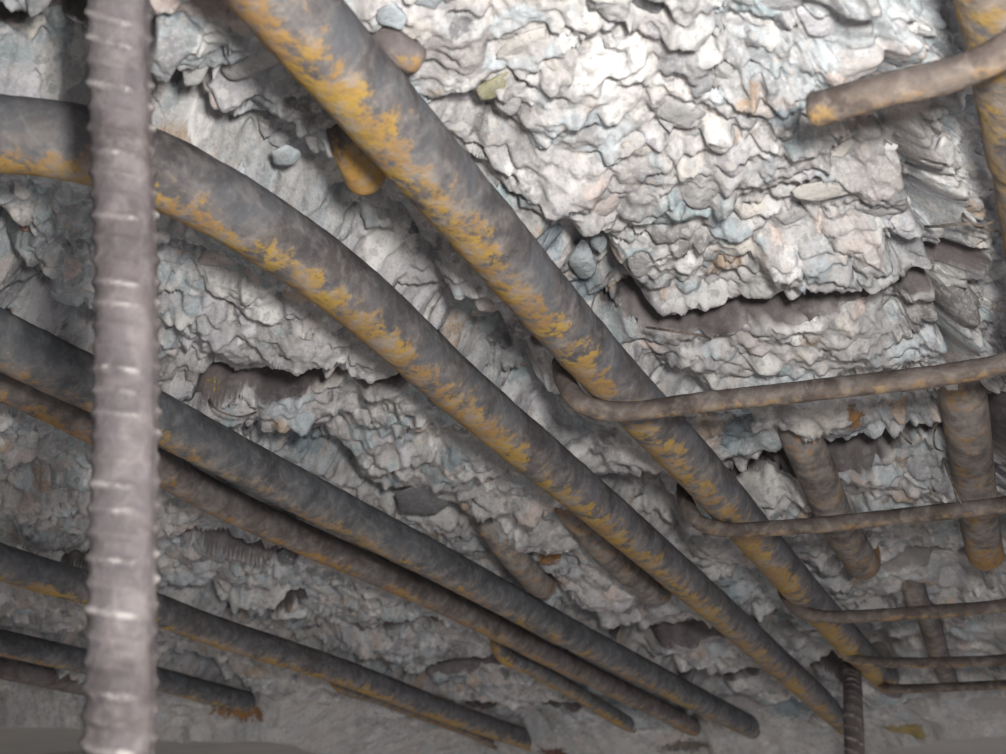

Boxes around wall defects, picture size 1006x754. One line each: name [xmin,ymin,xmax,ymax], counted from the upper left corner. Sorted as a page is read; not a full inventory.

spalling [223,0,1006,401]
spalling [0,0,163,754]
spalling [149,0,844,754]
spalling [618,375,1006,522]
rust [848,405,865,429]
rust [539,553,561,566]
spalling [730,513,1006,610]
spalling [807,612,1006,657]
rust [208,706,263,722]
spalling [841,658,1006,754]